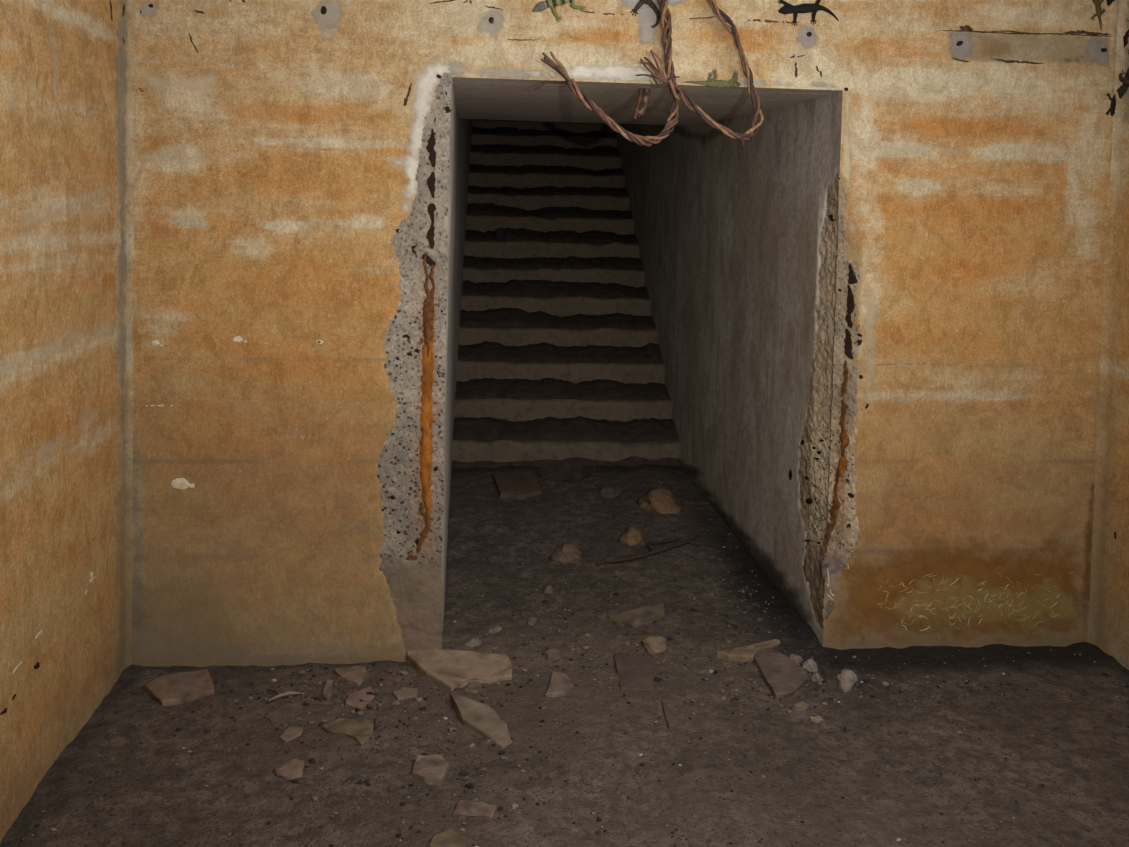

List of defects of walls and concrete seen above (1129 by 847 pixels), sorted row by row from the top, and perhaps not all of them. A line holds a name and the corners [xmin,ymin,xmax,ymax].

damp [387,62,464,210]
damp [486,65,660,81]
damp [739,55,805,86]
spalling [376,72,452,659]
spalling [789,173,869,629]